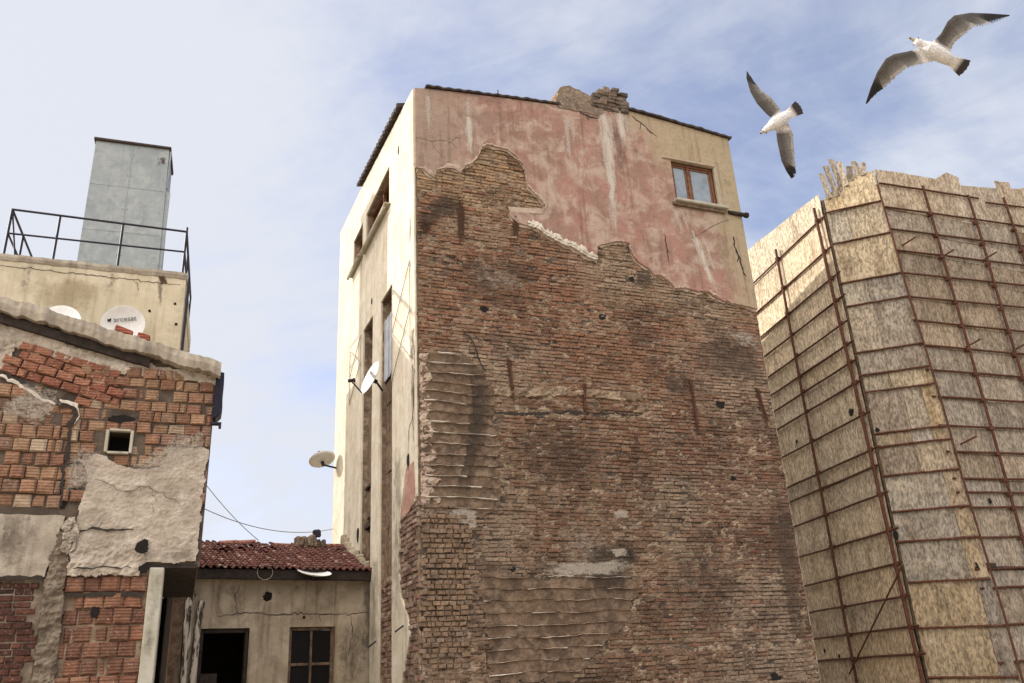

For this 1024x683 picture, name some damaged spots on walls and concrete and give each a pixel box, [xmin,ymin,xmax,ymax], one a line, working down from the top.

spalling [417,143,598,261]
water stain [599,111,628,227]
crack [692,219,746,276]
spalling [400,348,444,520]
crack [95,479,196,514]
crack [218,589,370,655]